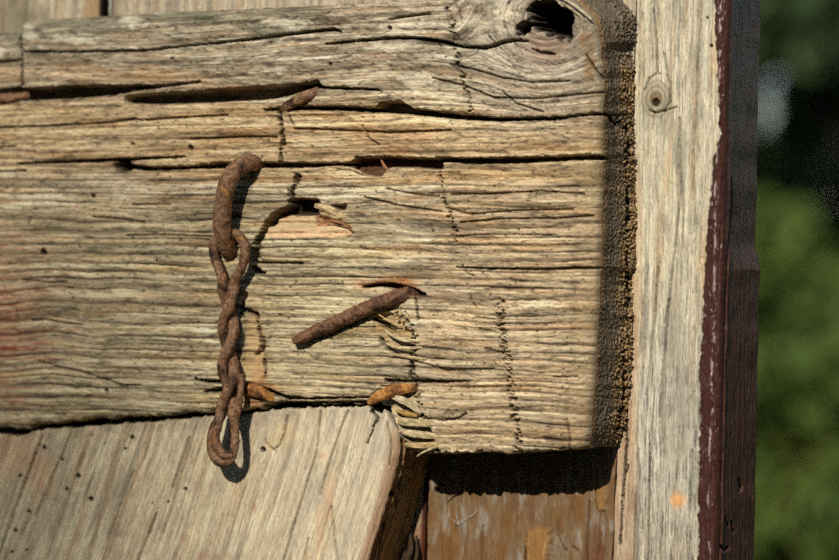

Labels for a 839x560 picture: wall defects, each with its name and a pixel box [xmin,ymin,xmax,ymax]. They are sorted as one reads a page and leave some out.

crack [0,0,622,205]
crack [91,203,212,238]
crack [363,152,611,244]
corrosion [347,274,429,314]
crack [37,359,143,387]
corrosion [242,395,269,409]
corrosion [258,370,285,393]
crack [198,221,404,560]
crack [361,263,604,454]
crack [171,436,190,489]
crack [0,429,73,557]
crack [137,513,158,560]